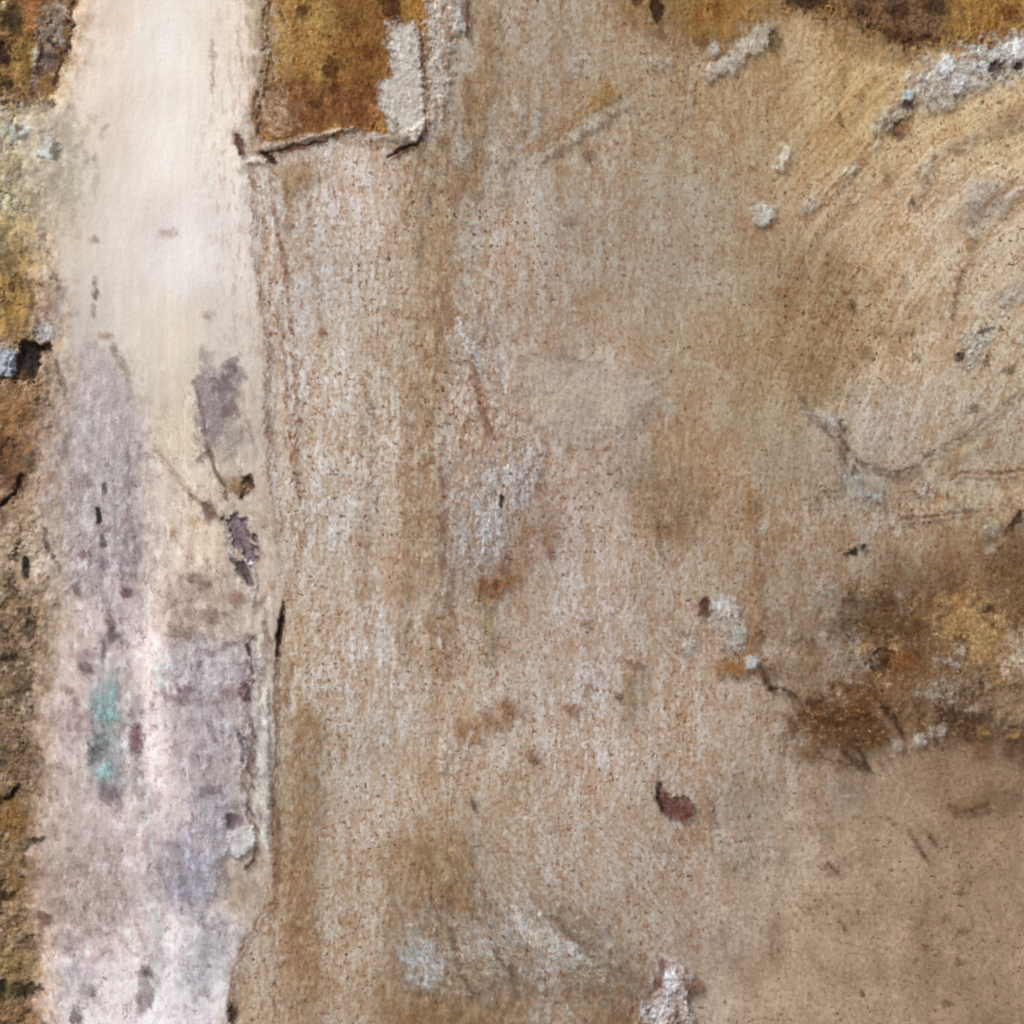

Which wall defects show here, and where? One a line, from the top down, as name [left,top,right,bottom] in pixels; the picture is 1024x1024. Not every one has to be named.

spalling [243,0,430,146]
crack [235,5,428,495]
peeling [0,323,145,611]
leakage [56,610,143,804]
leakage [166,572,226,643]
peeling [674,587,754,652]
crack [759,650,825,700]
leakage [155,697,241,934]
crack [270,565,297,1022]
leakage [69,985,96,1024]
leakage [133,967,157,1011]